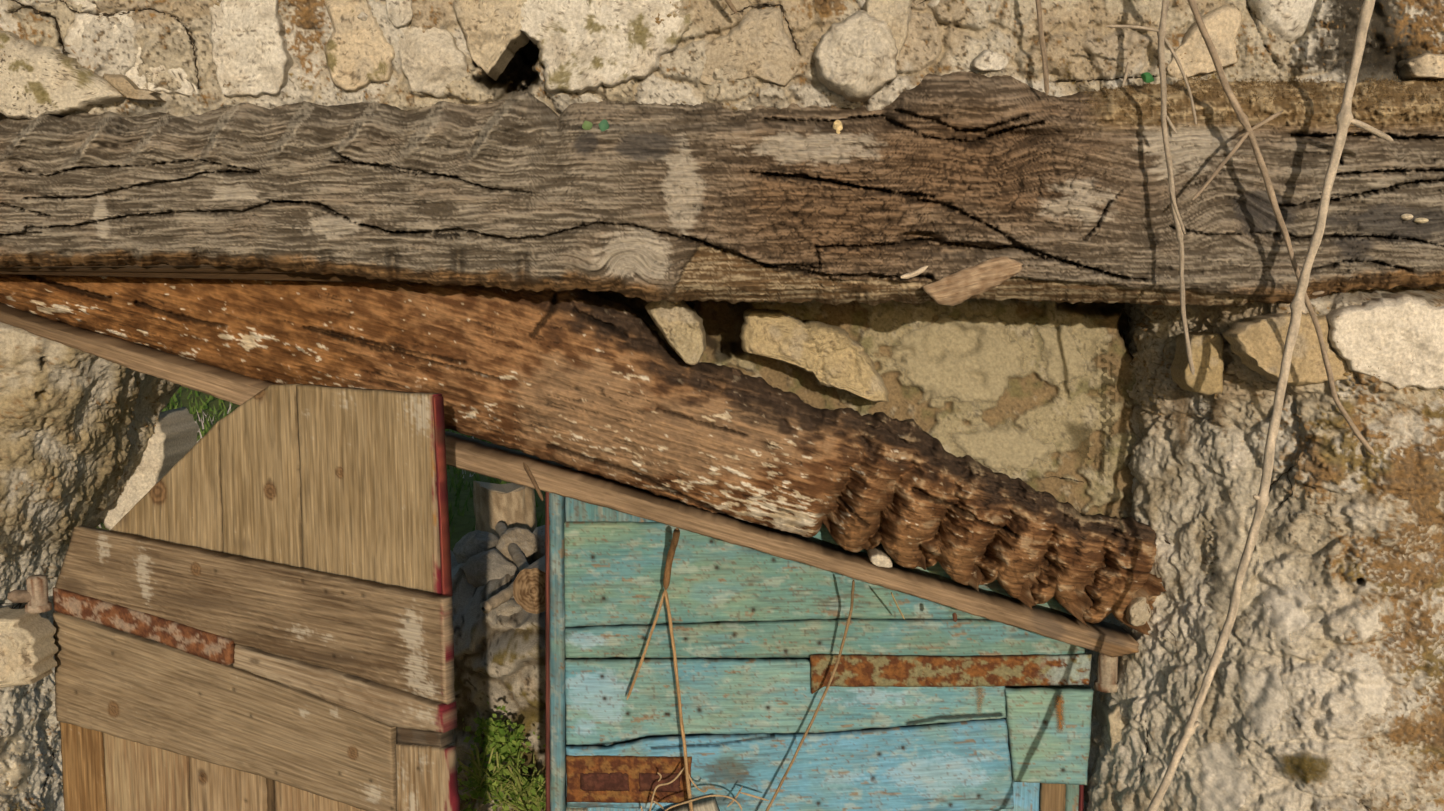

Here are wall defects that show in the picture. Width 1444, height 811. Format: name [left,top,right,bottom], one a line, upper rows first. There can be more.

crack [11,0,199,95]